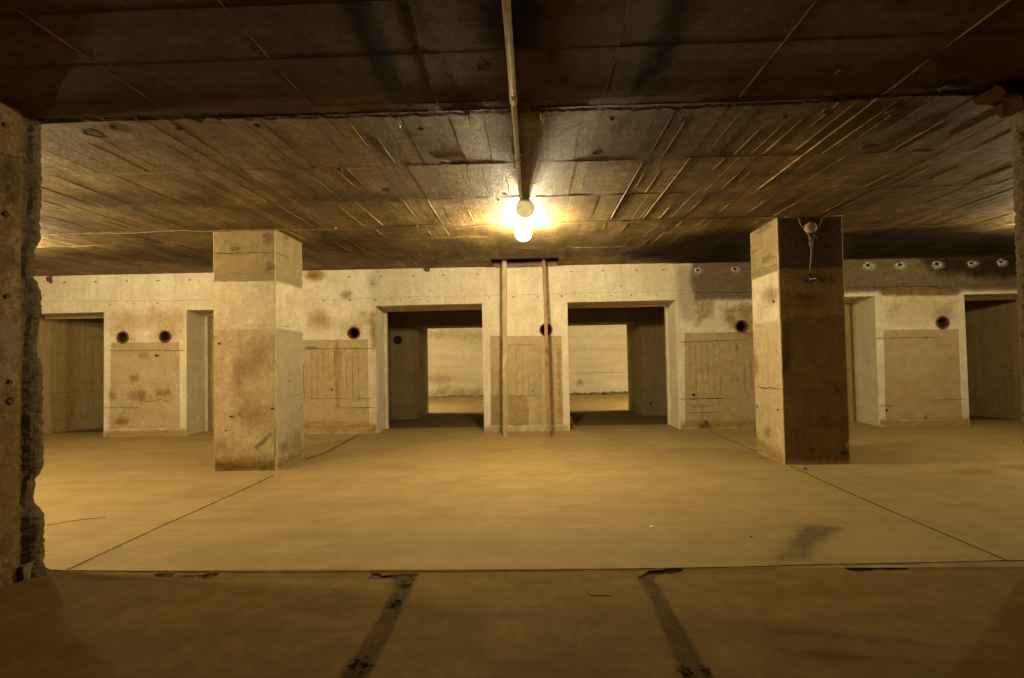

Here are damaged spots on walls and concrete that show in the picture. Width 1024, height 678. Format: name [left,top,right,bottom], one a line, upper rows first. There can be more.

spalling [19,114,66,578]
spalling [937,81,1024,443]